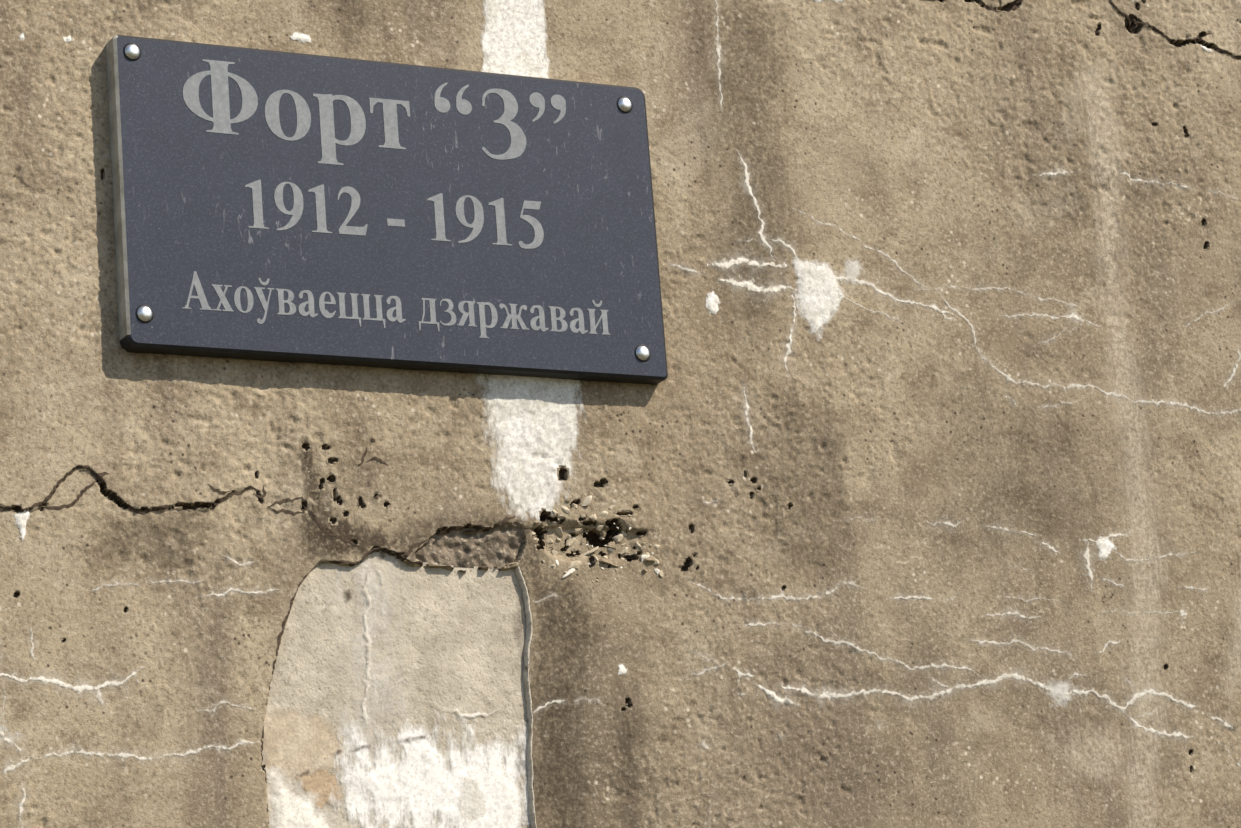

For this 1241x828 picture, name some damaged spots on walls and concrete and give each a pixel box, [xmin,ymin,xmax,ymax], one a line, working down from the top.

crack [931,0,1022,12]
crack [1110,0,1241,59]
efflorescence [795,260,860,337]
spalling [415,477,663,582]
crack [0,465,516,813]